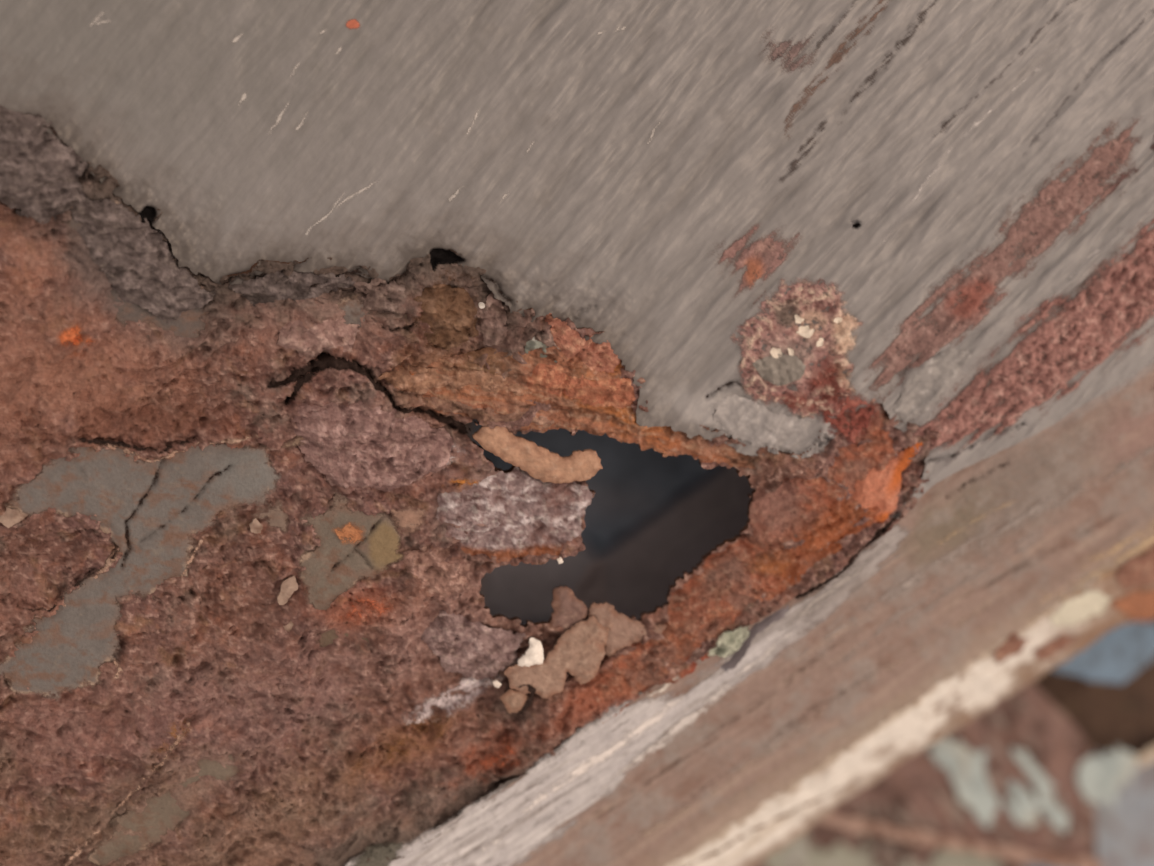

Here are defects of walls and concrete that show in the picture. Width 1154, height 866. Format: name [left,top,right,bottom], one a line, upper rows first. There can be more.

spalling [140,206,156,223]
spalling [430,249,464,270]
corrosion [870,122,1138,391]
peeling [524,336,557,362]
crack [267,352,471,434]
corrosion [0,104,651,866]
peeling [472,426,603,484]
corrosion [595,219,1154,685]
peeling [492,585,667,714]